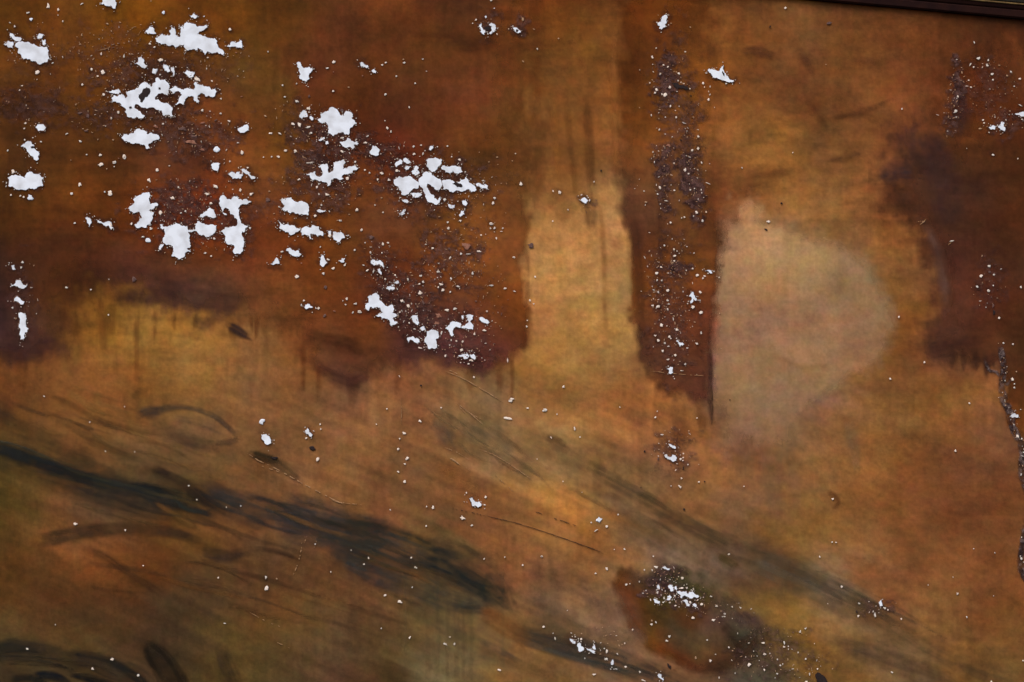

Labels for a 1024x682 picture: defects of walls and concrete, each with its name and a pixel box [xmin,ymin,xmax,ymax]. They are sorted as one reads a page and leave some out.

peeling [1,0,523,378]
corrosion [0,0,542,386]
corrosion [621,0,722,406]
peeling [641,239,720,379]
peeling [634,47,740,224]
damp [711,204,895,458]
corrosion [885,32,1024,436]
peeling [936,54,1024,135]
peeling [644,427,699,488]
peeling [570,627,626,670]
peeling [625,556,752,634]